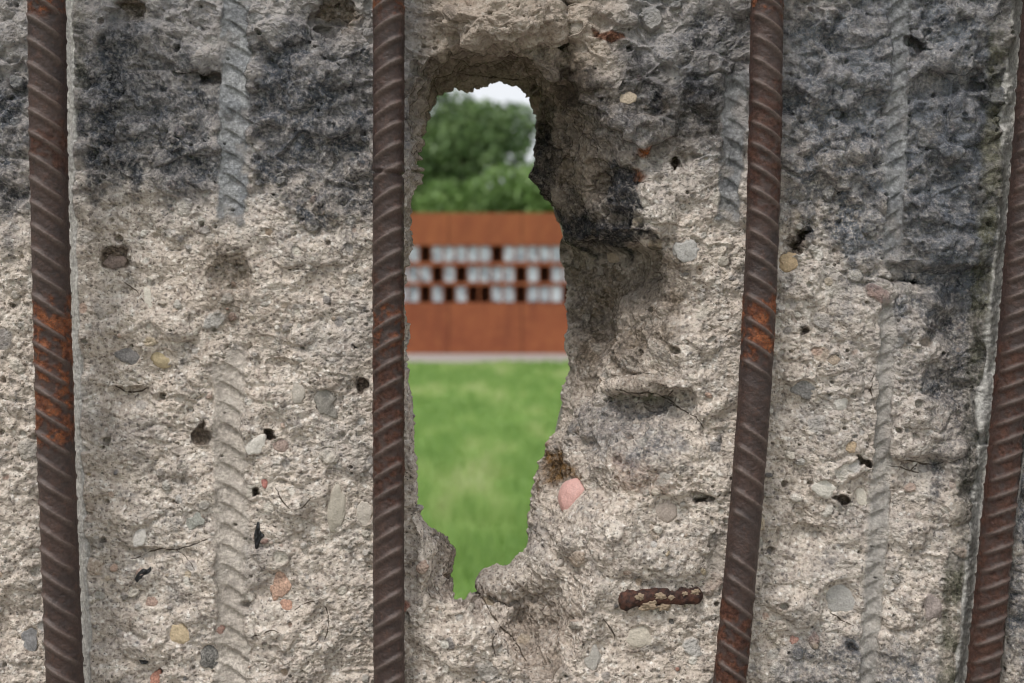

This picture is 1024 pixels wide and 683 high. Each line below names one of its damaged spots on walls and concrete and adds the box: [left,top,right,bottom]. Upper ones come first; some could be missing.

damp [76,20,220,204]
damp [248,25,374,228]
damp [781,0,894,264]
damp [894,0,1004,409]
corrosion [32,295,75,443]
corrosion [740,295,777,360]
corrosion [714,598,753,683]